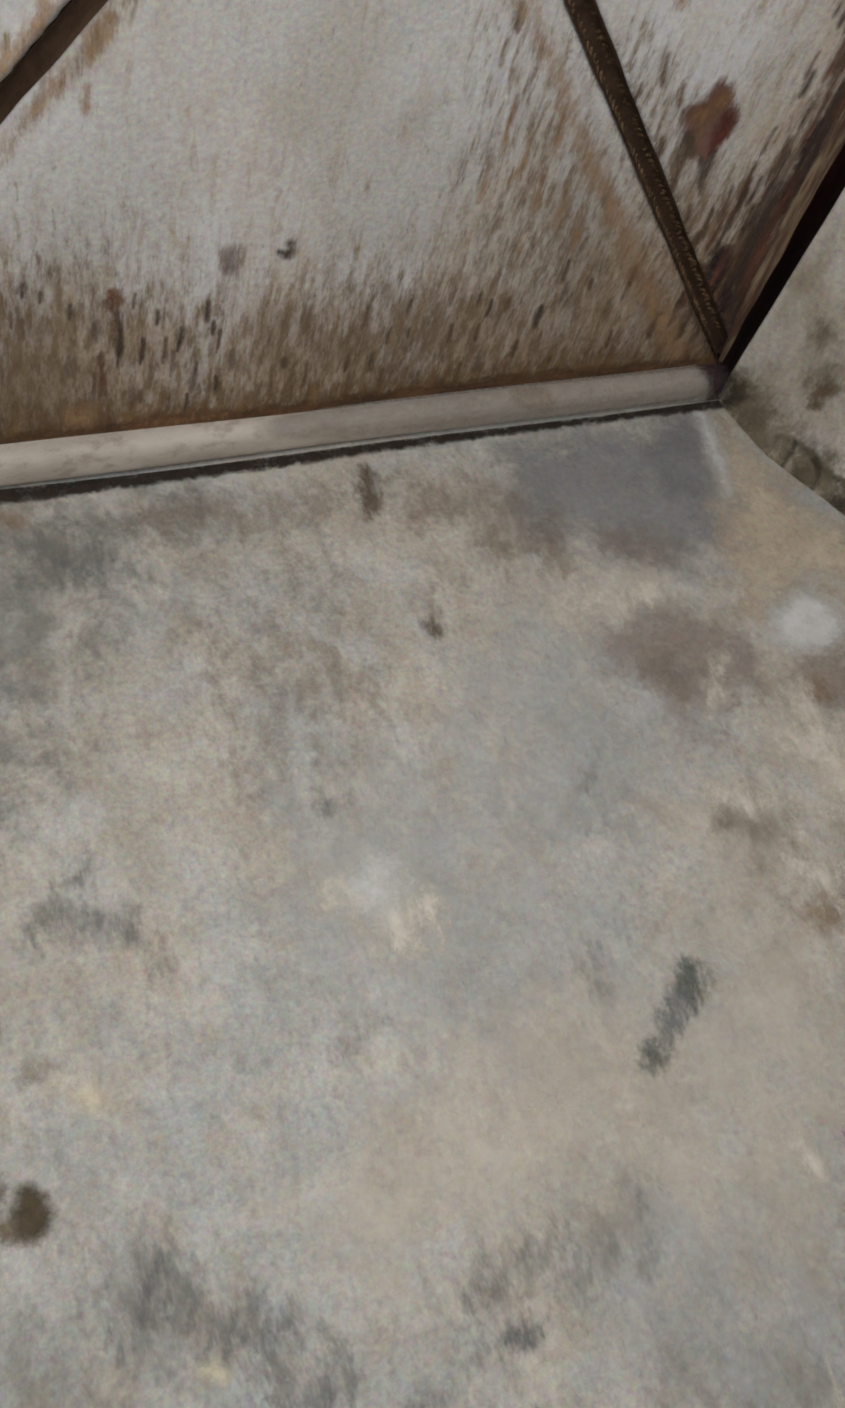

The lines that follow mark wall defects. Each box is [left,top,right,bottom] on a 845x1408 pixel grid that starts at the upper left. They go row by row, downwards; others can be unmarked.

rust [0,3,845,445]
damp [723,373,845,514]
damp [804,365,840,409]
damp [609,615,760,711]